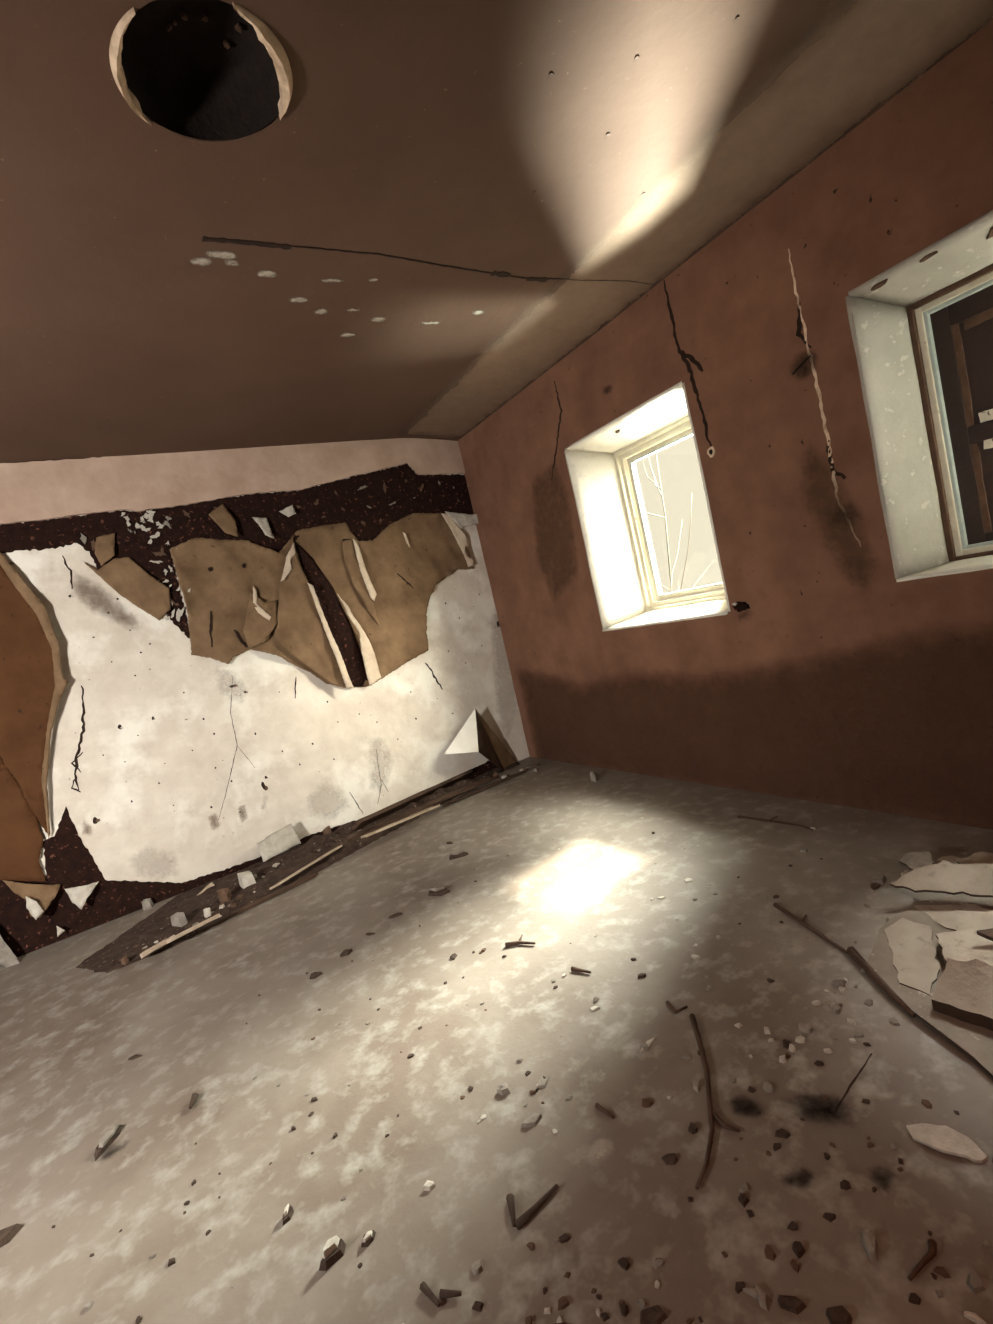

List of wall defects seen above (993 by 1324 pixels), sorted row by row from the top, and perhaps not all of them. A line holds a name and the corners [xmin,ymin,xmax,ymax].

crack [202,236,712,446]
crack [552,381,562,477]
crack [788,249,861,547]
flaking render [0,463,478,638]
flaking render [465,761,499,780]
flaking render [0,807,263,967]
flaking render [298,819,359,845]
peeling [428,886,450,896]
peeling [447,842,468,860]